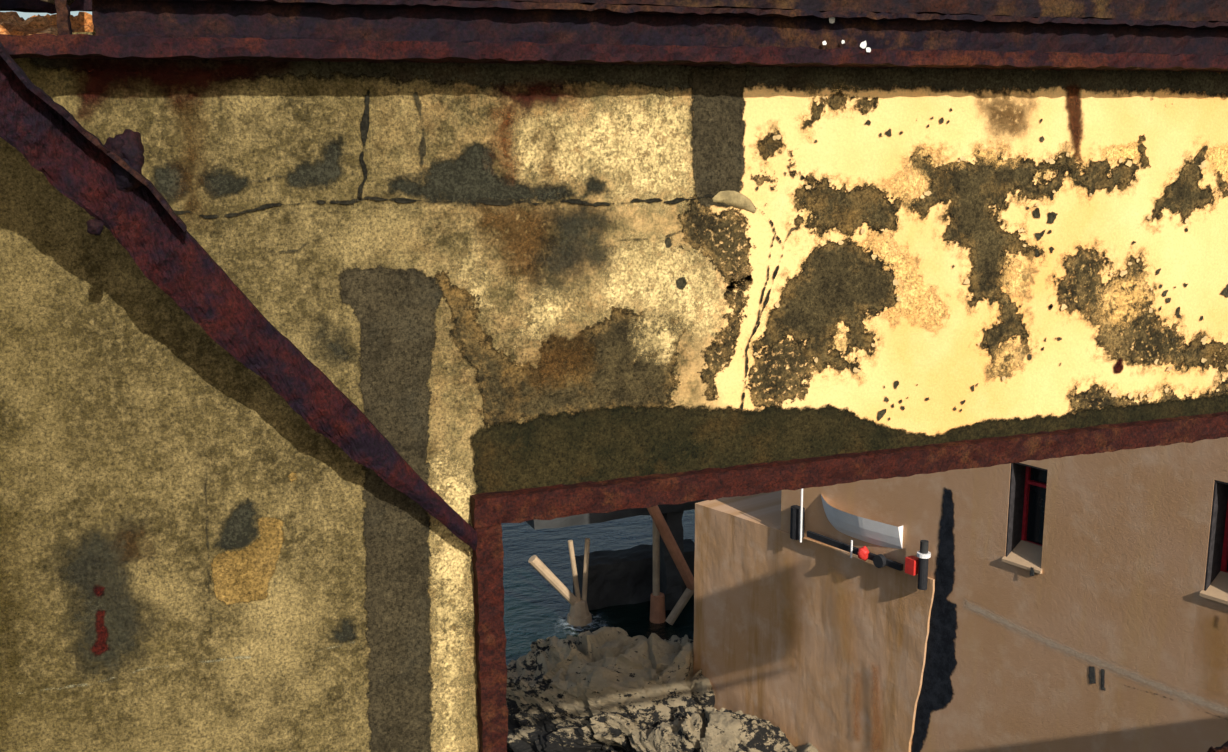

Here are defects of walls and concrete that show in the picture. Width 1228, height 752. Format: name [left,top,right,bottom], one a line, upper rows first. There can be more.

rust [74,58,289,211]
crack [174,90,714,240]
leakage [389,142,610,287]
rust [981,95,1026,135]
rust [1066,85,1083,160]
crack [741,206,797,410]